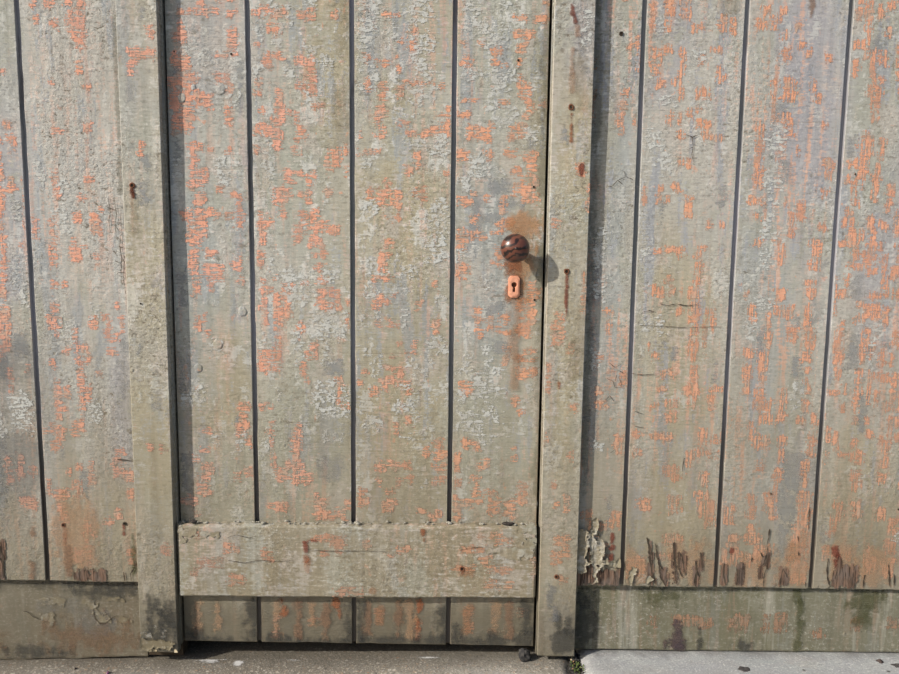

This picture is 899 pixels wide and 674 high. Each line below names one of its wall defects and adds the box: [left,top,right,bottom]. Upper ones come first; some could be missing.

peeling [28,0,92,91]
peeling [126,8,157,76]
peeling [580,7,595,46]
peeling [615,0,737,219]
rust [504,247,538,300]
peeling [580,224,614,335]
peeling [18,461,97,526]
peeling [181,427,222,517]
peeling [160,527,247,587]
peeling [549,480,654,586]
water stain [663,619,686,651]
water stain [793,590,804,651]